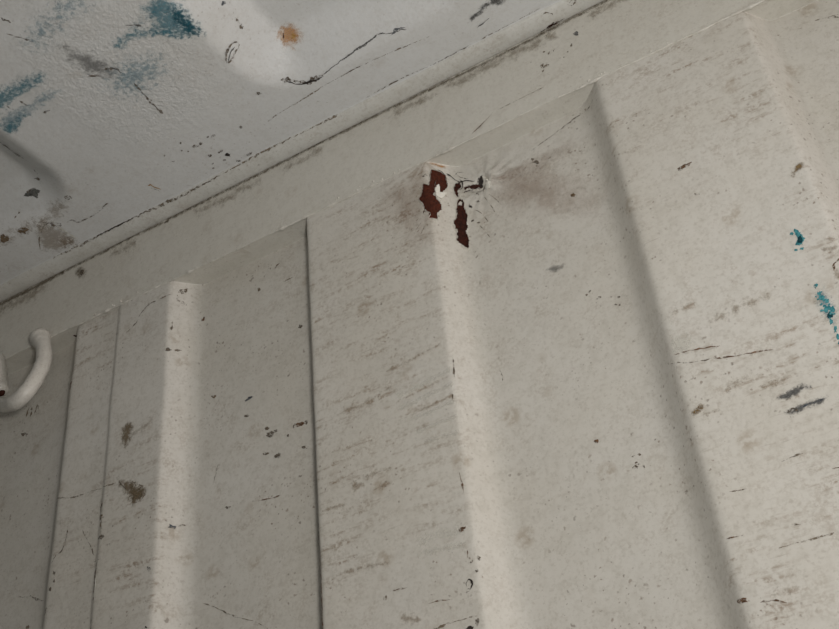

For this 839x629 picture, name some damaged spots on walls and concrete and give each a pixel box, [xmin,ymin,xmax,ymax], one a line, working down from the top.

peeling [119,481,145,503]